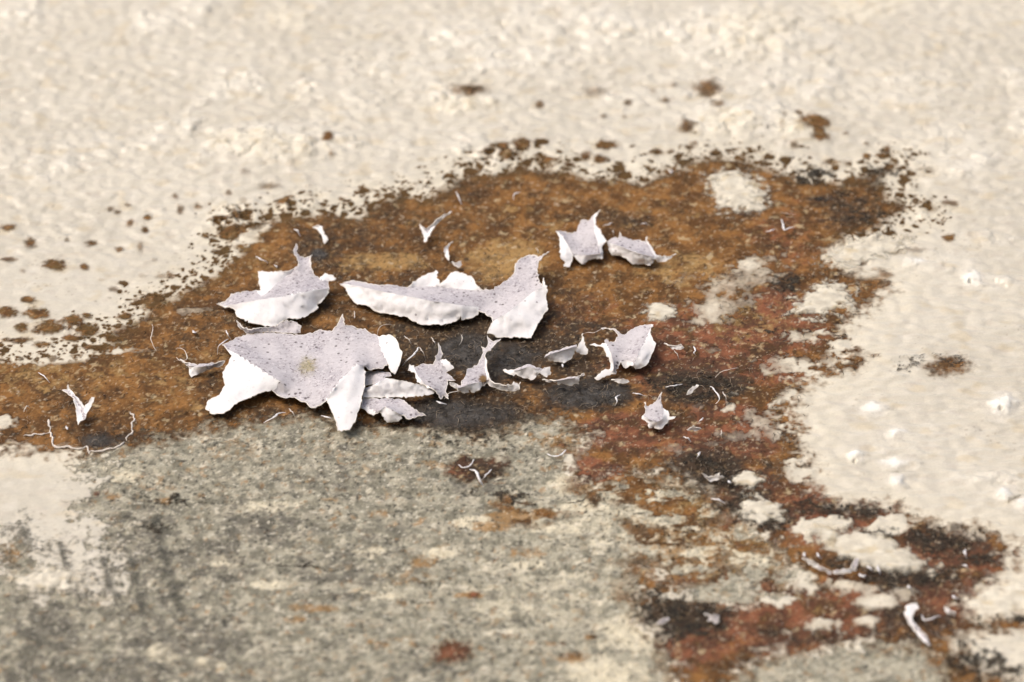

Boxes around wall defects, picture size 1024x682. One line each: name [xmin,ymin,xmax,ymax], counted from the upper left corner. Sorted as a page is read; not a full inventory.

leakage [78,433,122,447]
spalling [0,210,859,682]
leakage [412,400,521,454]
rust [0,137,1024,682]
leakage [140,493,206,506]
leakage [493,479,536,506]
spalling [721,603,950,682]